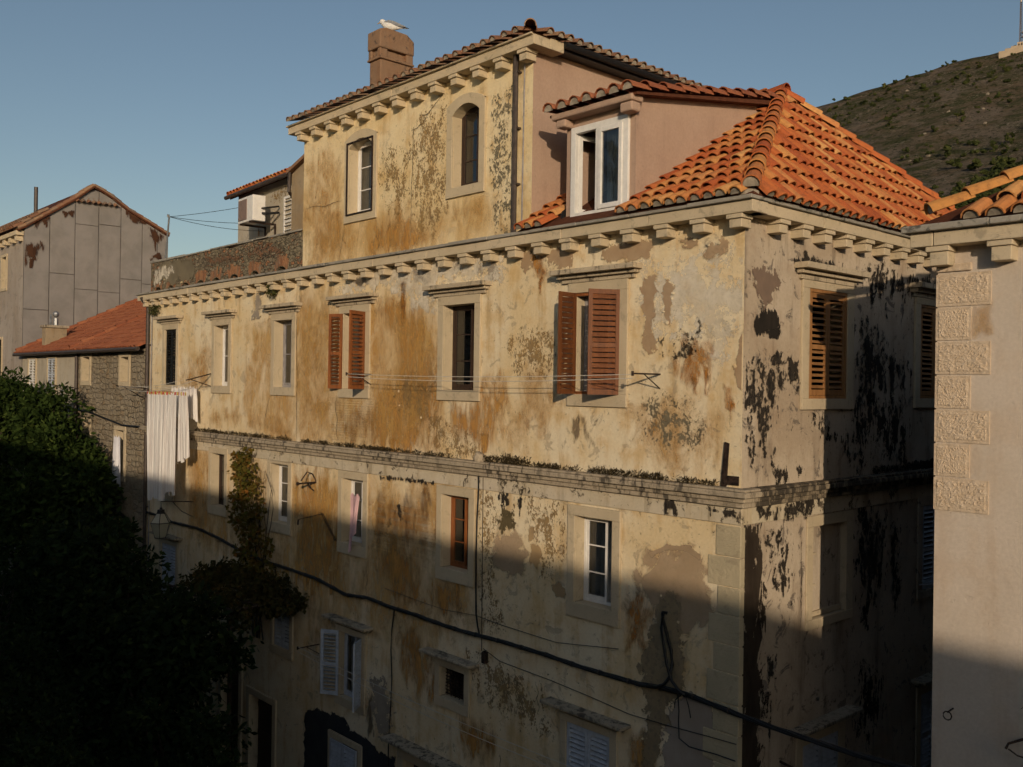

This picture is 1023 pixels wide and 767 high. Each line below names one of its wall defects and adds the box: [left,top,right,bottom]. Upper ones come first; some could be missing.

peeling [507,328,558,378]
peeling [601,238,653,263]
peeling [639,274,675,356]
peeling [680,236,729,259]
peeling [749,264,781,312]
mould [745,308,802,485]
damp [794,250,843,274]
mould [808,263,936,476]
peeling [478,489,506,635]
peeling [527,496,567,579]
mould [853,505,902,631]
spalling [636,591,688,767]